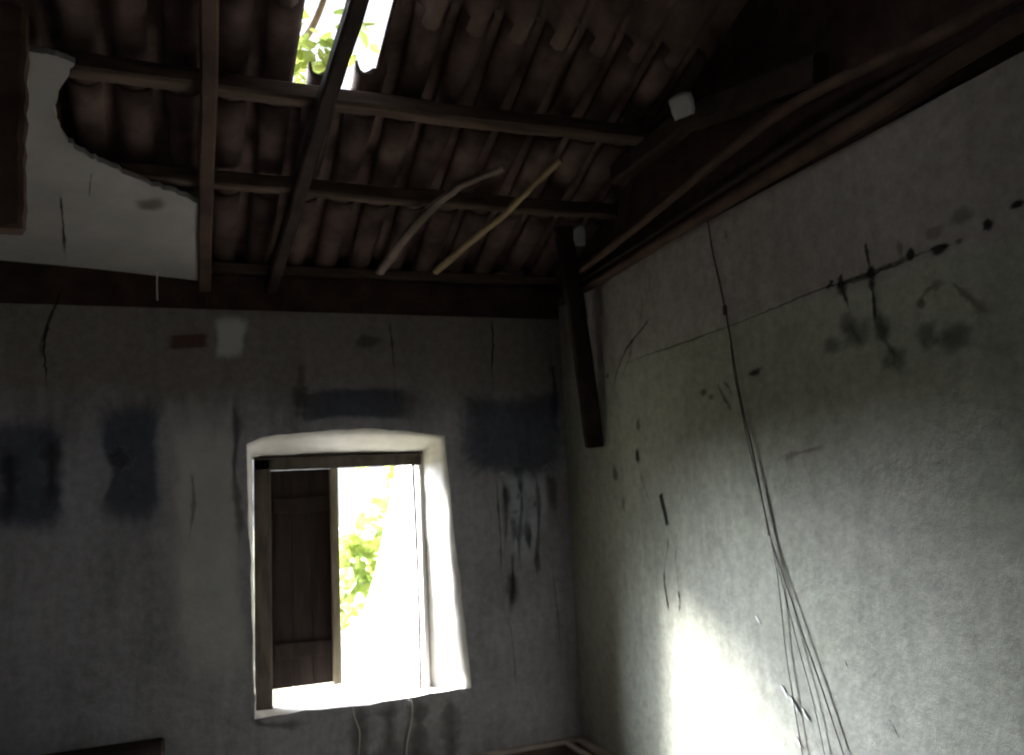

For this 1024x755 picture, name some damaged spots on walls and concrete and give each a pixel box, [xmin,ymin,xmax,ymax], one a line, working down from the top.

spalling [306,62,325,86]
spalling [350,60,387,93]
water stain [865,244,876,318]
water stain [931,244,948,254]
crack [43,293,60,374]
crack [606,258,906,390]
water stain [0,429,59,522]
water stain [105,411,155,513]